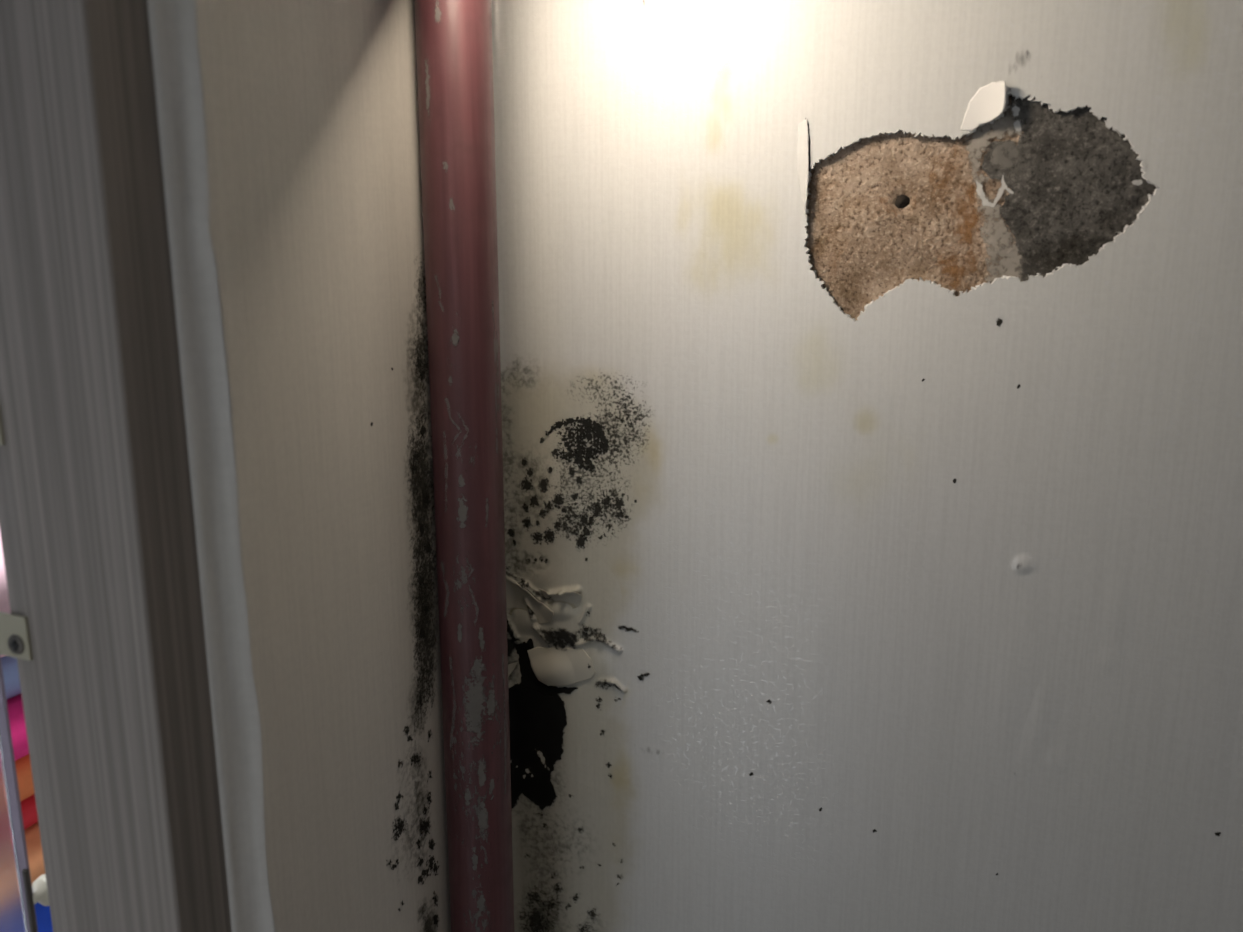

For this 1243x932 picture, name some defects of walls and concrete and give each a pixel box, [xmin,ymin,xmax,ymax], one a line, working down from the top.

spalling [797,81,1160,322]
damp [507,381,644,564]
damp [391,331,439,932]
damp [506,566,615,827]
damp [520,874,578,932]